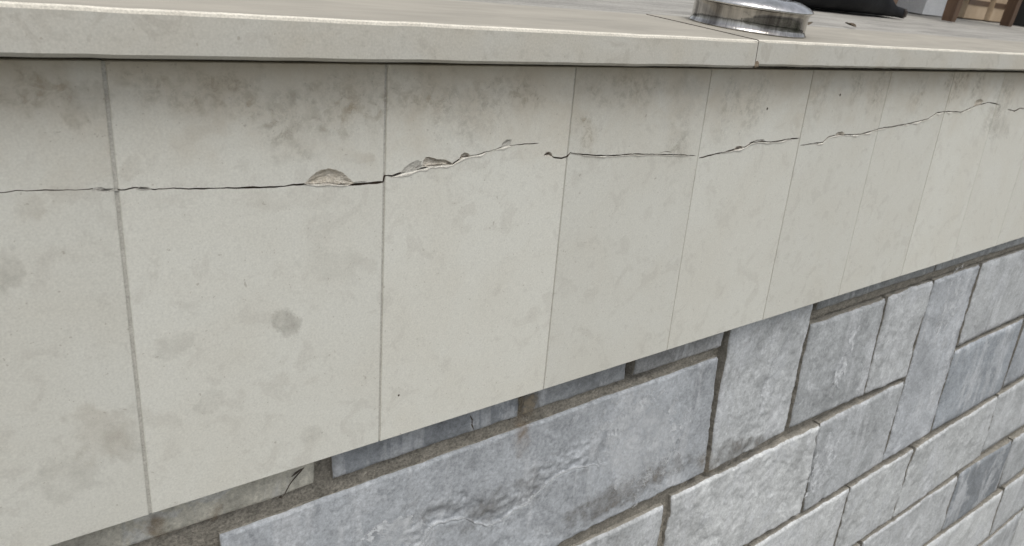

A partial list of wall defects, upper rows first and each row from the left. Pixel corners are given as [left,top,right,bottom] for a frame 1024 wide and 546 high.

crack [0,102,1021,193]